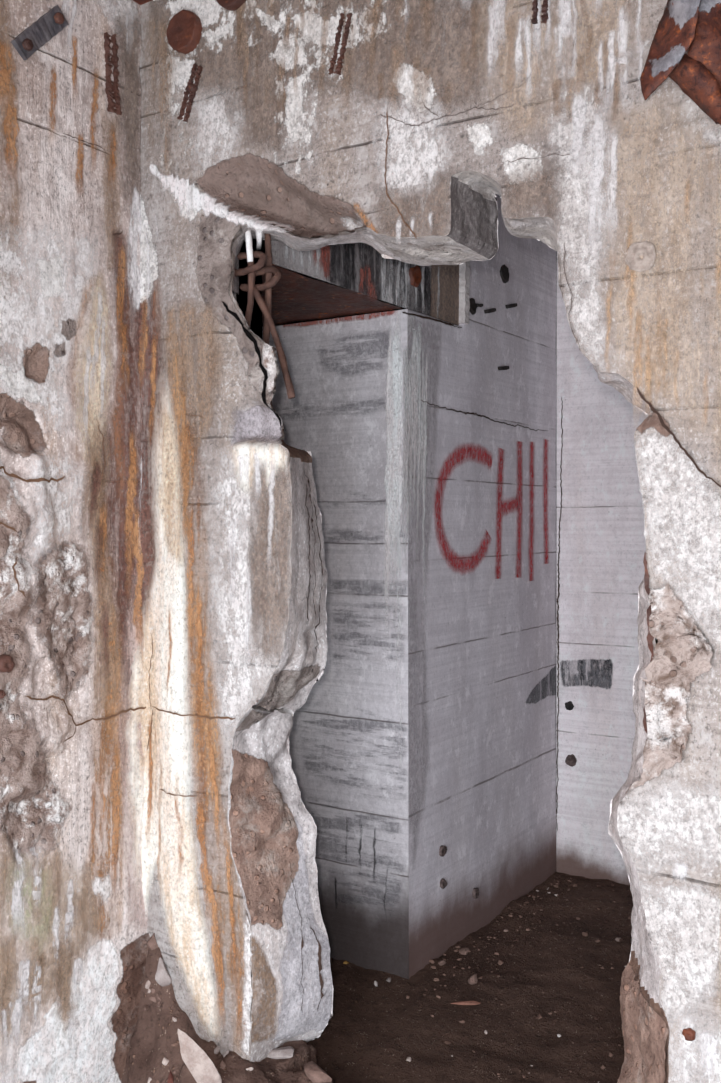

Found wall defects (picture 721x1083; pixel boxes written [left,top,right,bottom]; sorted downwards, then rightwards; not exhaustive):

rust [0,0,19,165]
spalling [0,463,94,860]
crack [26,636,235,749]
rust [85,235,248,1032]
water stain [76,0,293,309]
crack [222,301,281,430]
water stain [215,405,291,730]
spalling [228,429,329,1062]
spalling [158,0,558,410]
water stain [152,0,721,404]
spalling [608,579,712,1083]
crack [637,388,721,487]